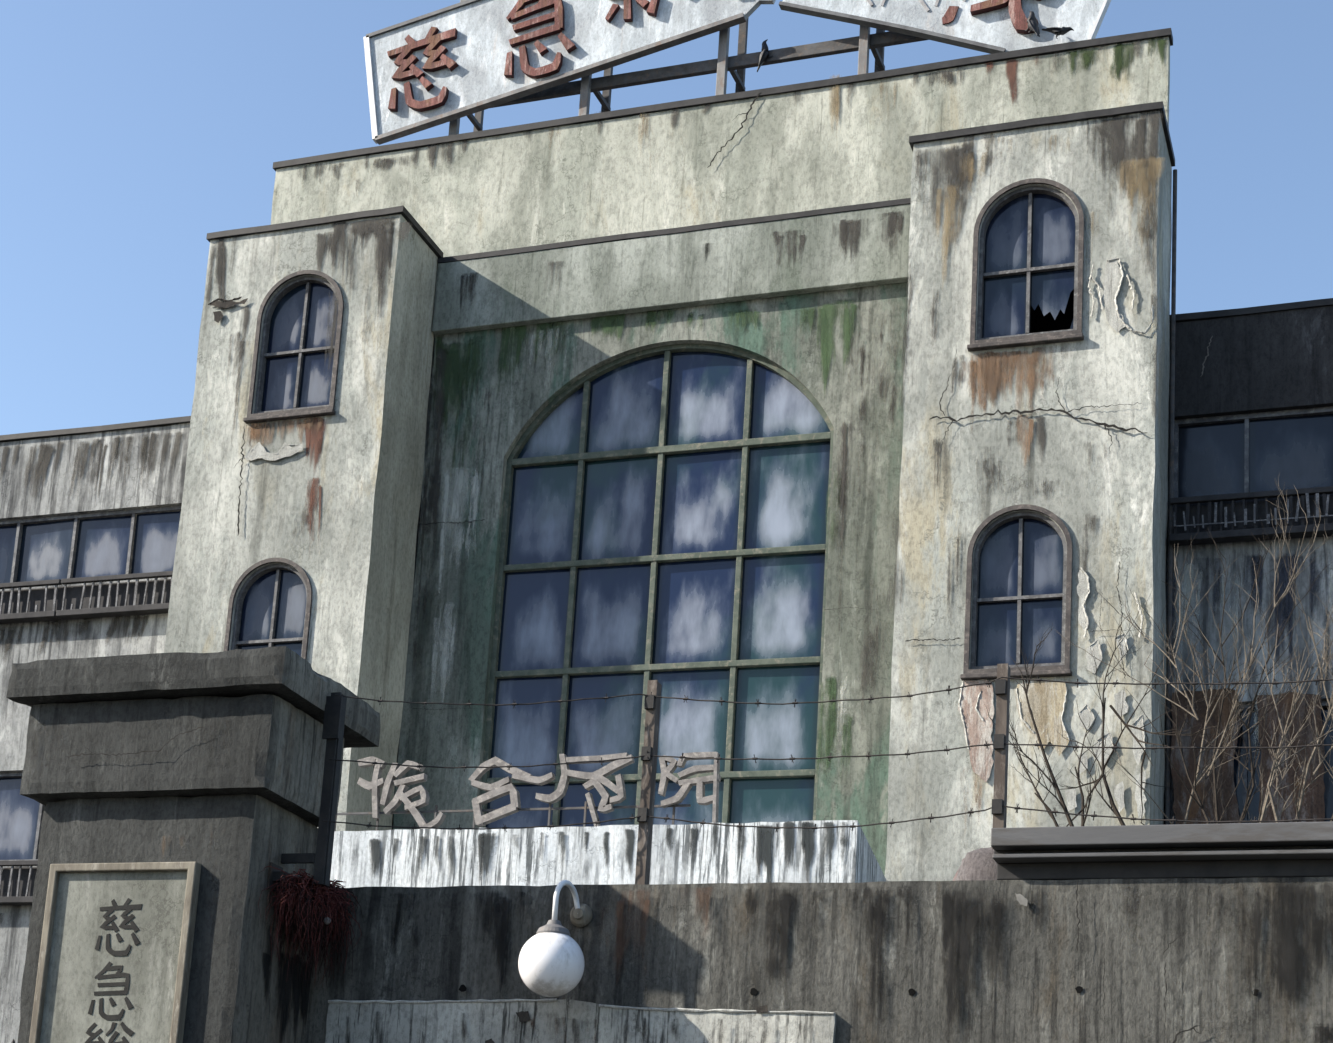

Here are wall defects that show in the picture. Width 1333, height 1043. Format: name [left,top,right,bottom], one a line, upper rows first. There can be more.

crack [707,93,760,168]
damp [917,134,994,274]
damp [1087,110,1161,321]
peeling [1088,258,1154,335]
corrosion [971,348,1050,409]
crack [929,350,1148,450]
damp [0,432,182,495]
corrosion [250,417,324,531]
damp [418,348,483,583]
damp [836,423,847,539]
spalling [958,679,994,782]
damp [943,890,1002,1040]